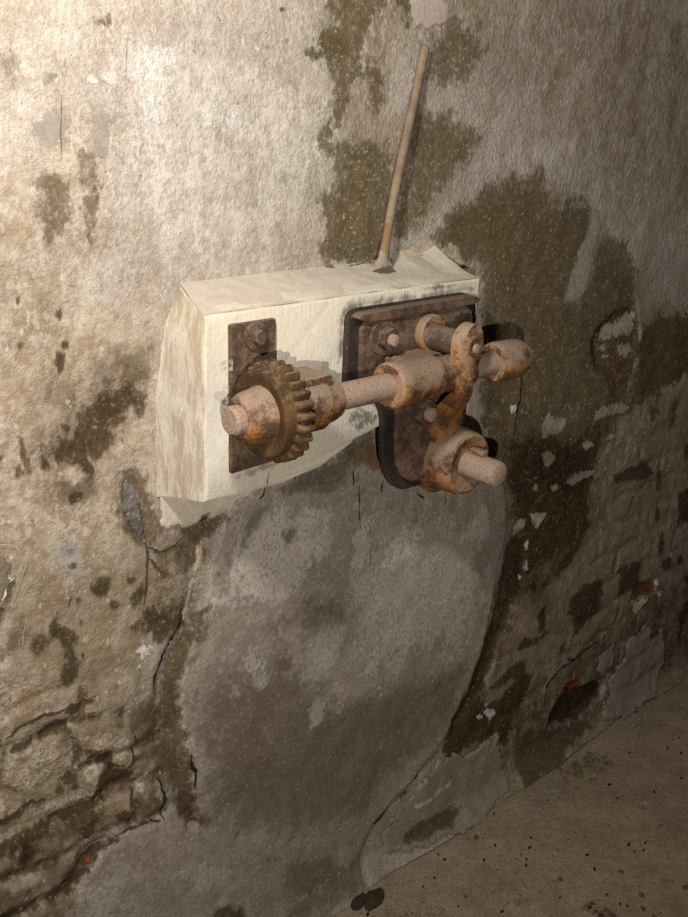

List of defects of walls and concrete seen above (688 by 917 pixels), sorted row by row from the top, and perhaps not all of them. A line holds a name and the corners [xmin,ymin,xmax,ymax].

damp [304,0,489,264]
damp [0,165,688,838]
crack [142,532,180,608]
crack [153,607,183,690]
spalling [99,753,144,792]
crack [189,755,197,788]
spalling [99,809,132,826]
flaking render [57,836,120,895]